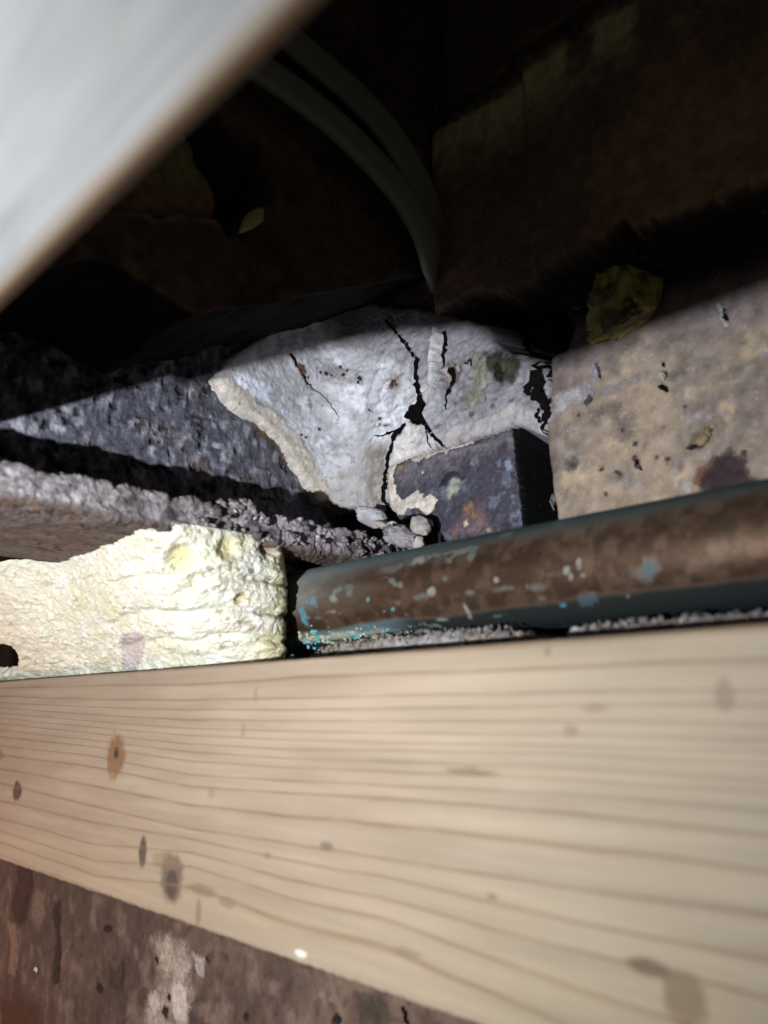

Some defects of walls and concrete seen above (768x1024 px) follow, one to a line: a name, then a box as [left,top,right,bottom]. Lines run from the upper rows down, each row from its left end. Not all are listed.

crack [290,353,339,417]
crack [374,319,445,509]
crack [523,360,552,436]